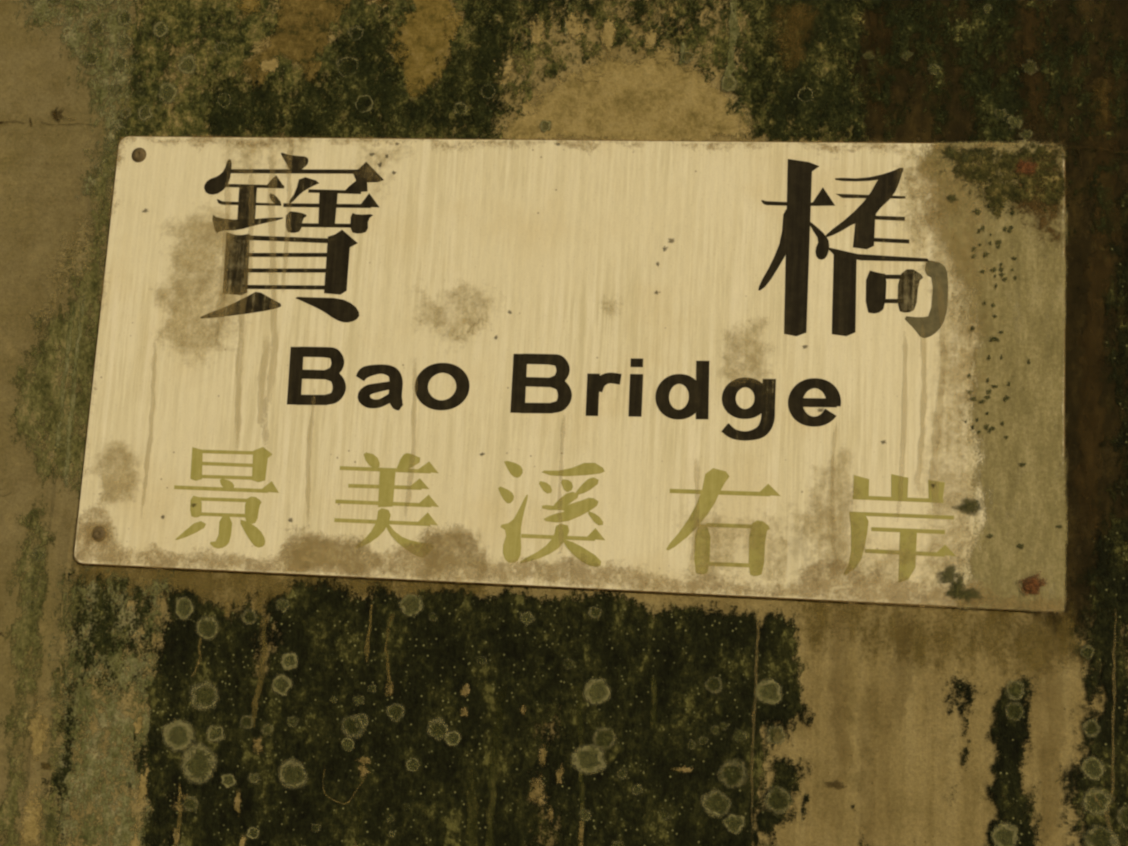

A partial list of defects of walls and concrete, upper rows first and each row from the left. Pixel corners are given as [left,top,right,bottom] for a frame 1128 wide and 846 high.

water stain [724,0,740,78]
water stain [799,0,1128,671]
water stain [73,564,485,727]